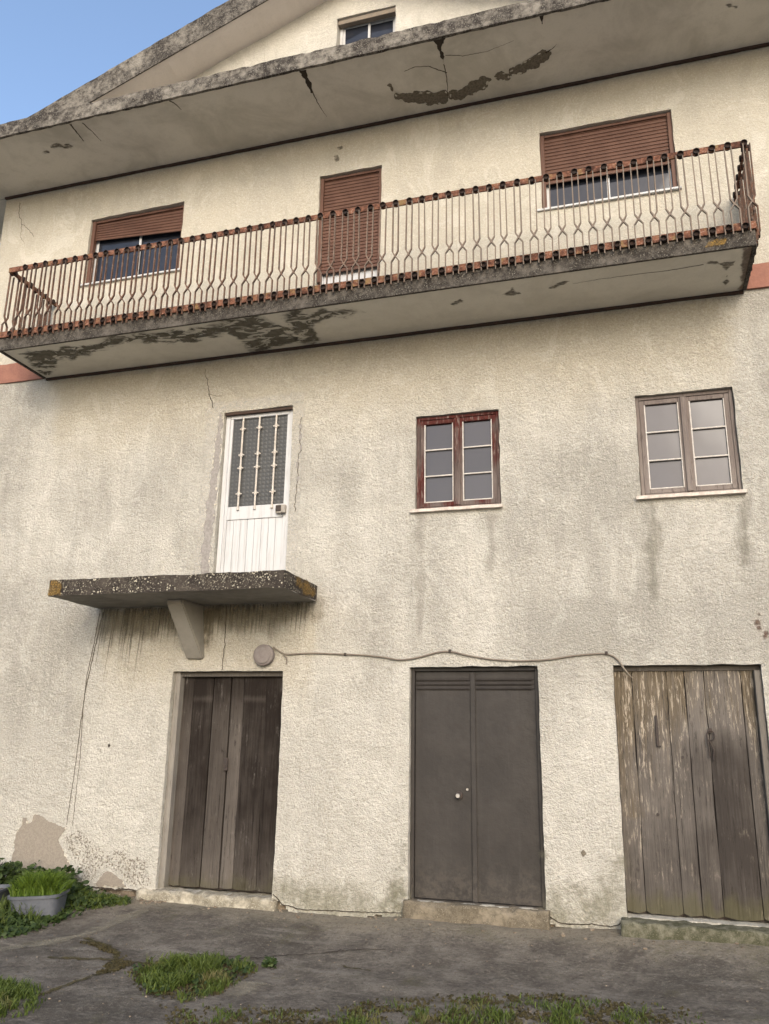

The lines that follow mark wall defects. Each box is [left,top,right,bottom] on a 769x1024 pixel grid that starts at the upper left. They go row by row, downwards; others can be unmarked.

crack [299,70,325,114]
crack [404,41,512,96]
peeling [387,44,557,106]
crack [294,417,302,512]
water stain [98,607,176,651]
water stain [203,602,313,643]
peeling [9,814,151,887]